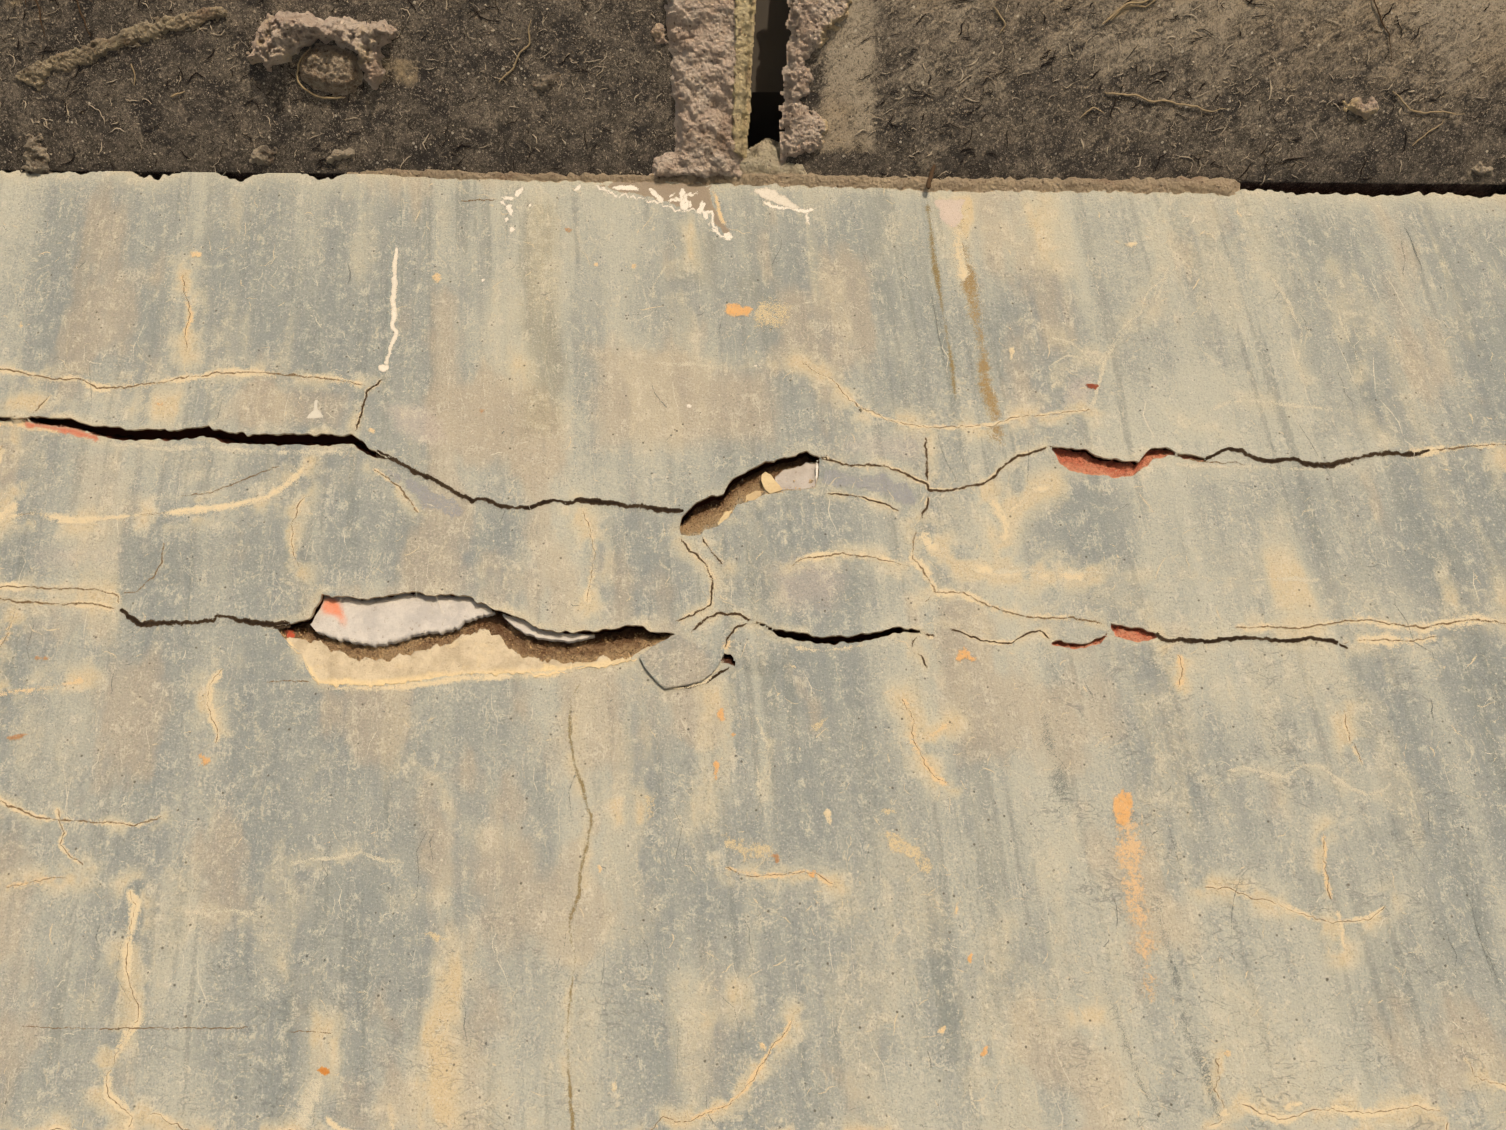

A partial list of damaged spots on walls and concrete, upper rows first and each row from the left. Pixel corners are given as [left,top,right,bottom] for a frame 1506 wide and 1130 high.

crack [0,365,1102,668]
spalling [680,451,920,536]
spalling [1050,445,1206,478]
crack [1174,441,1506,473]
spalling [277,591,735,693]
spalling [1052,623,1157,649]
crack [1155,610,1506,652]
crack [564,682,594,1130]